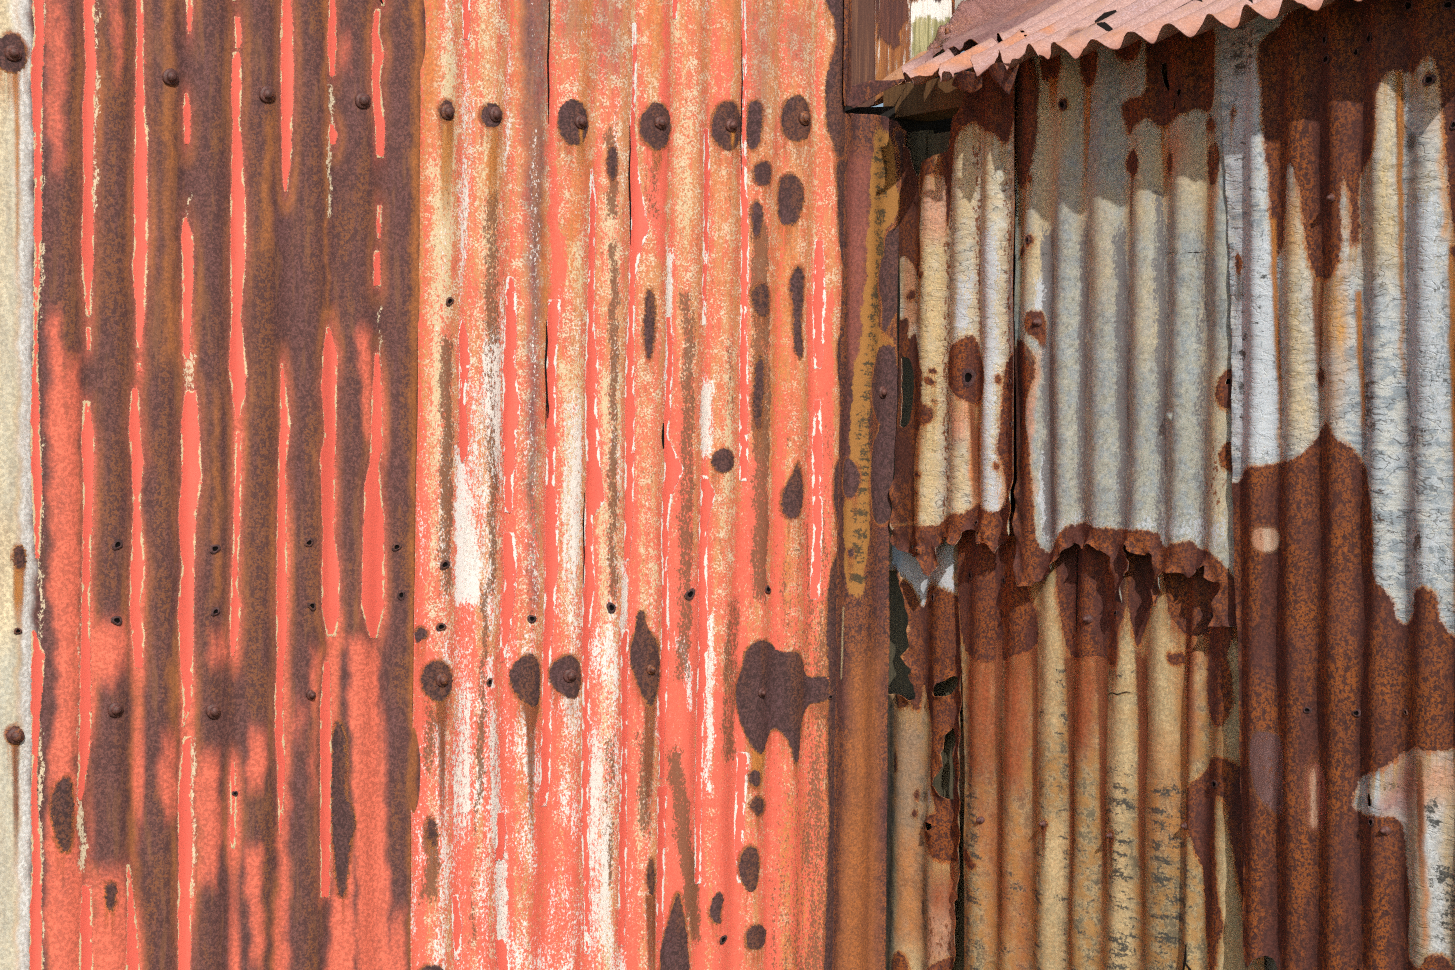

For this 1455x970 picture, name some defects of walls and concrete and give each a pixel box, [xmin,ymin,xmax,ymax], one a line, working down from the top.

corrosion [639,102,672,151]
corrosion [710,0,845,263]
corrosion [832,0,1455,970]
corrosion [48,776,77,855]
corrosion [103,880,118,912]
corrosion [330,721,357,899]
corrosion [734,548,855,970]